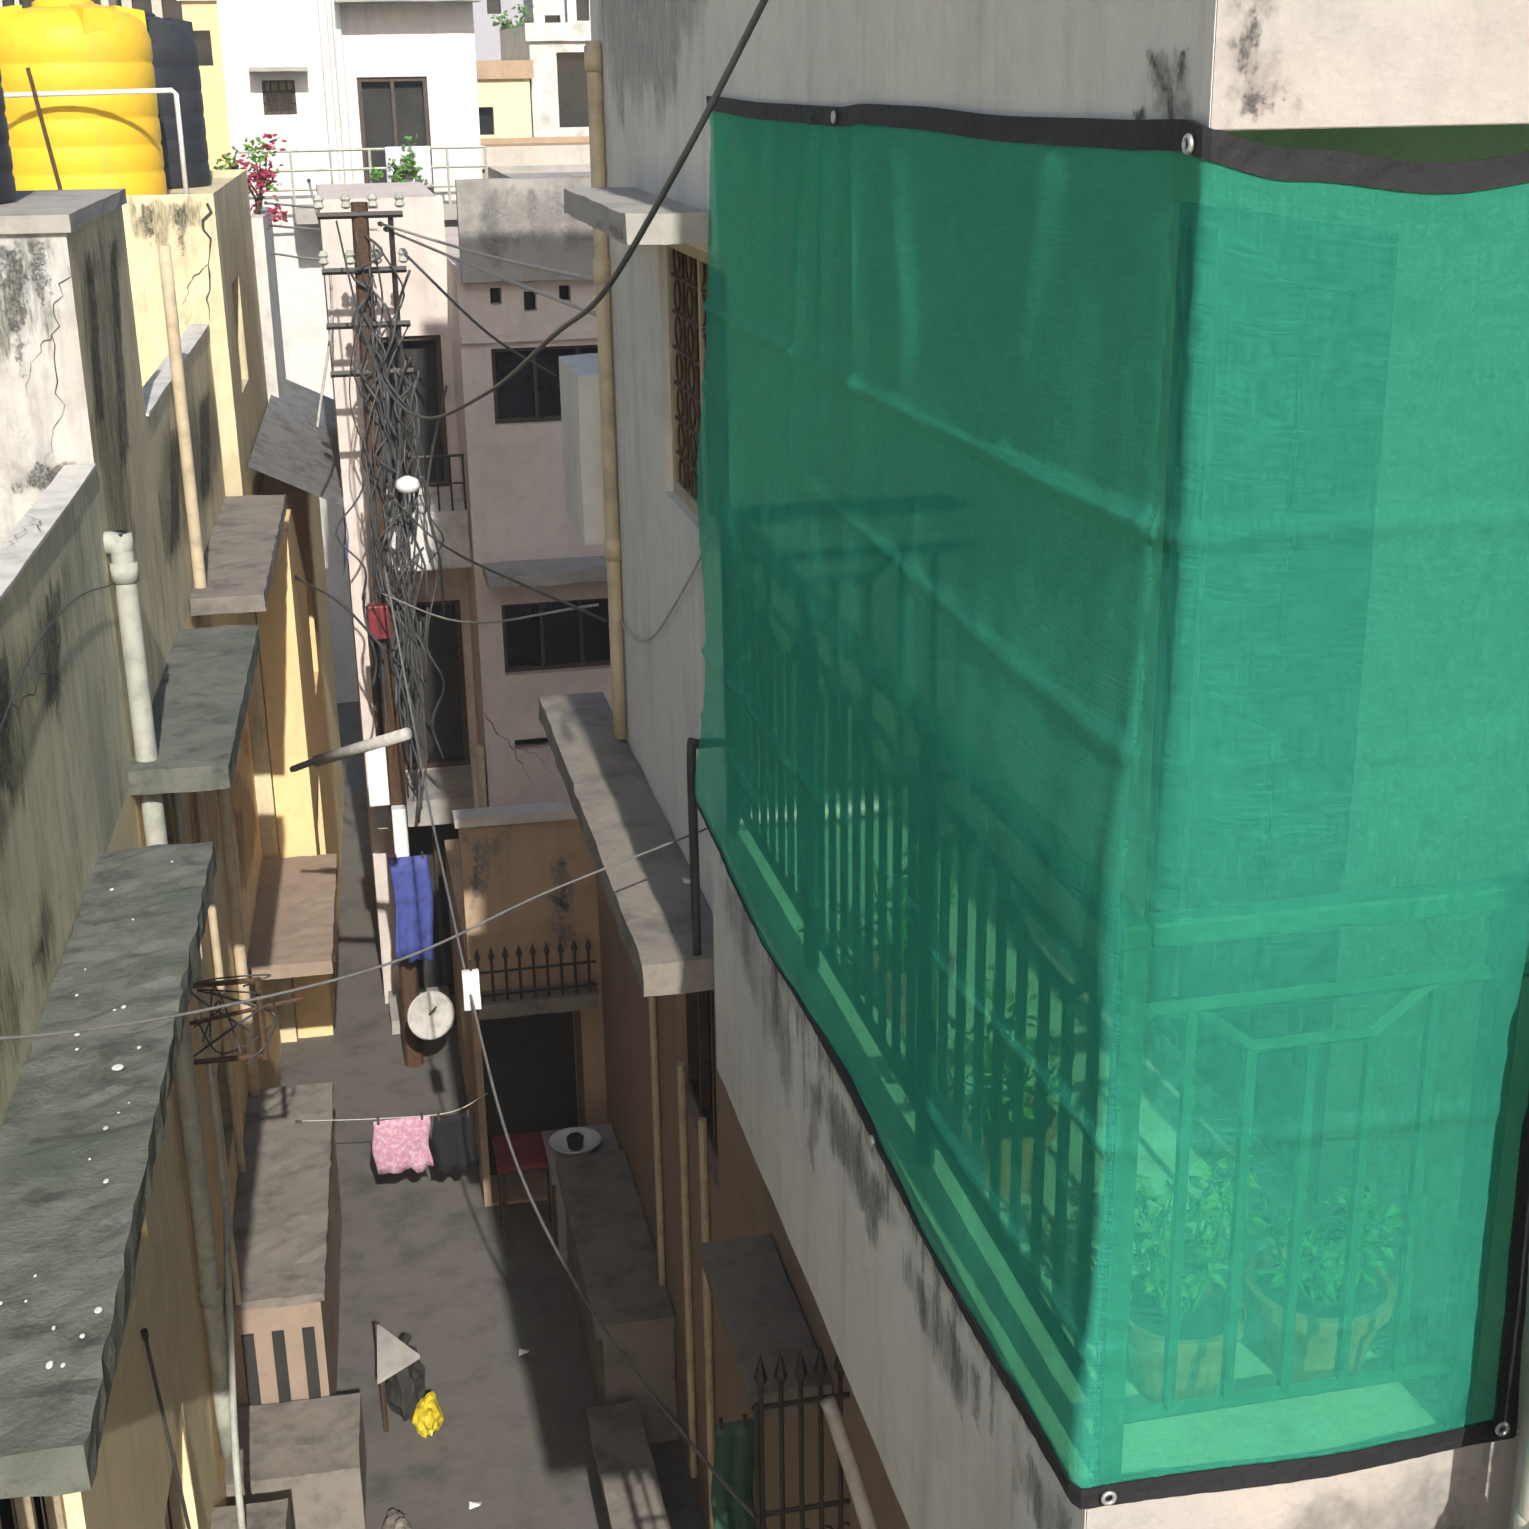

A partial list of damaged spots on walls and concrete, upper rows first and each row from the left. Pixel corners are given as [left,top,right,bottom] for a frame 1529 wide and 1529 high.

water stain [1233,0,1258,70]
water stain [1243,93,1274,115]
water stain [135,203,195,256]
water stain [0,242,51,361]
water stain [83,238,135,537]
water stain [13,462,67,492]
water stain [159,387,222,554]
water stain [0,569,70,806]